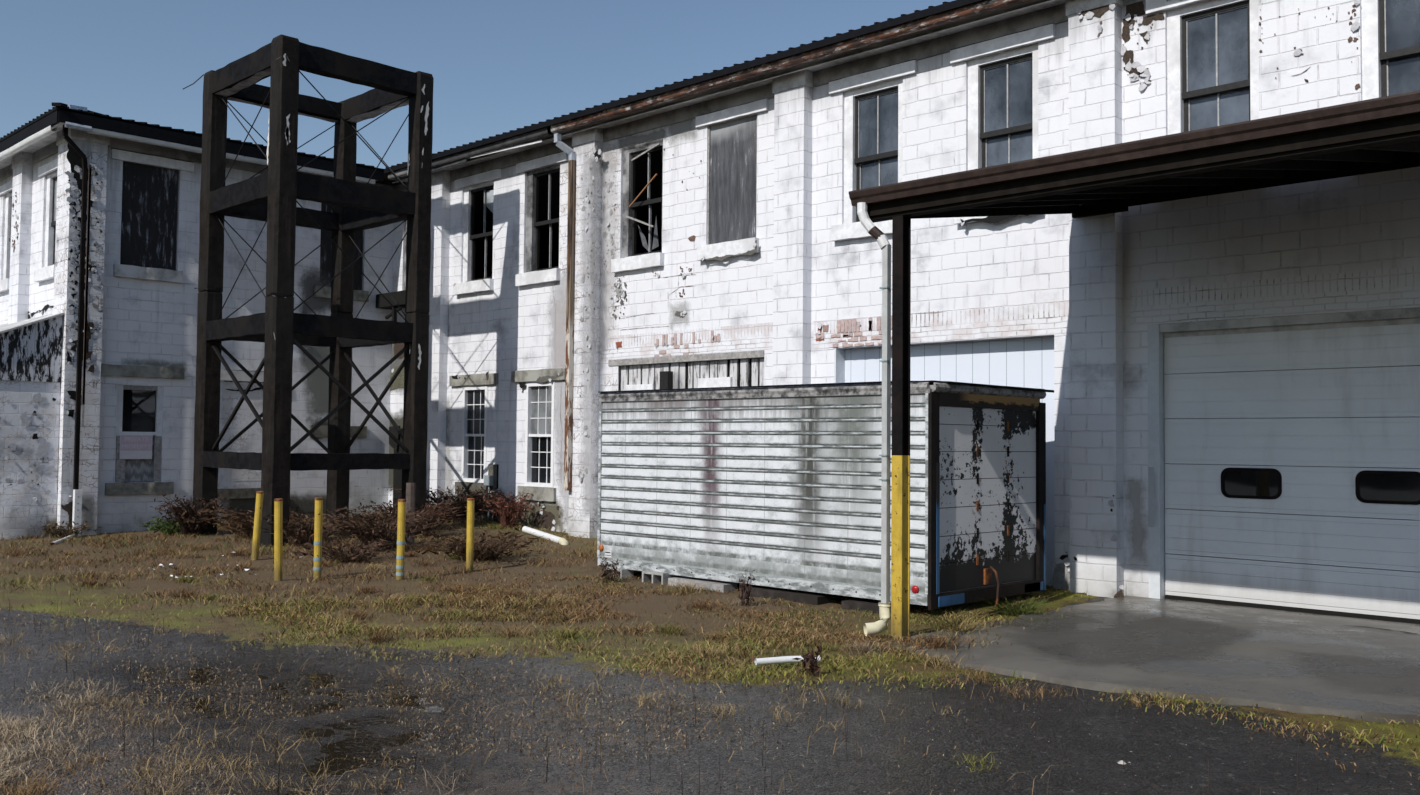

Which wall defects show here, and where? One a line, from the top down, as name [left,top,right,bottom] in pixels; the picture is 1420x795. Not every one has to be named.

peeling [1076,0,1168,91]
peeling [28,144,104,373]
peeling [815,316,892,347]